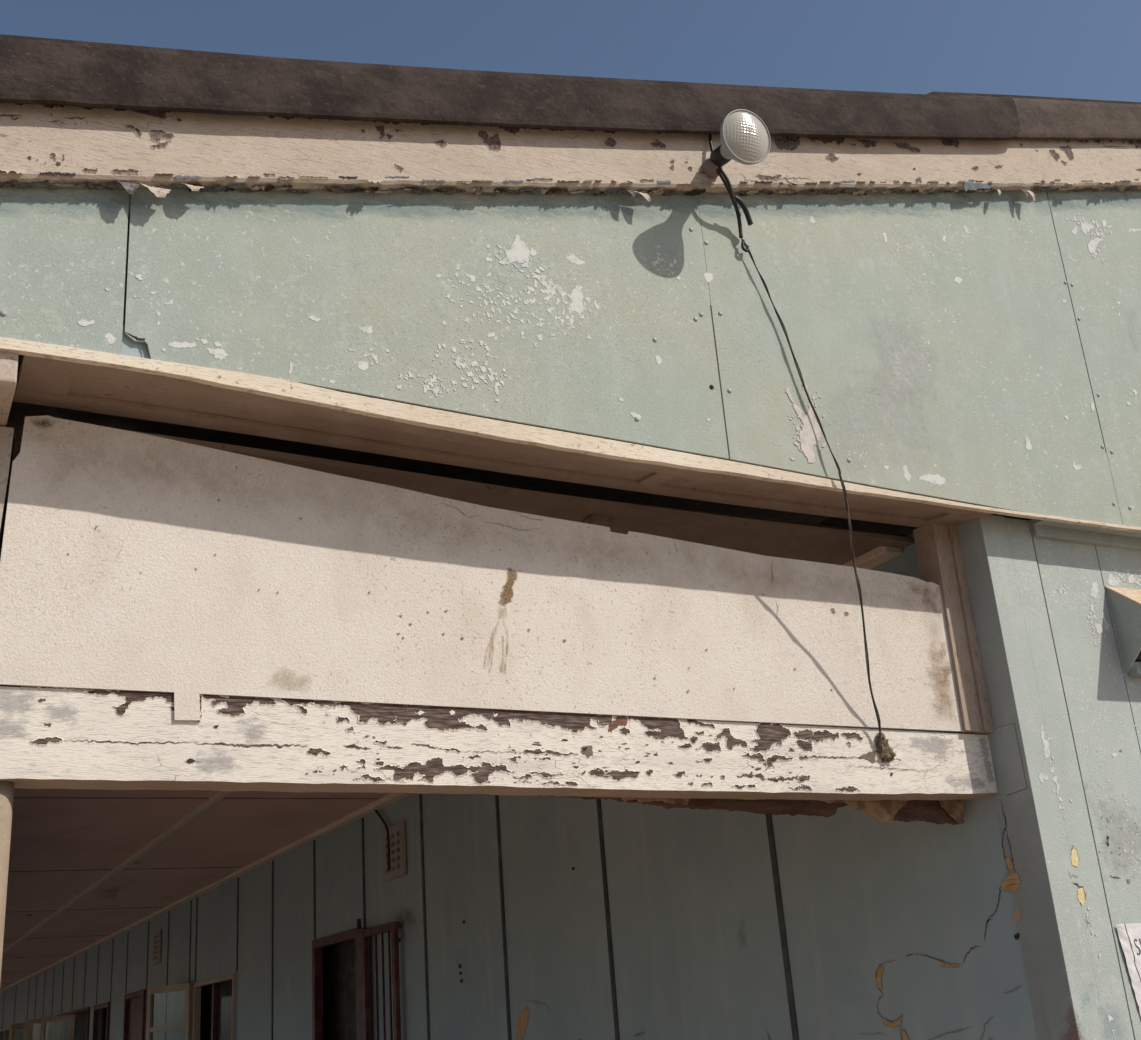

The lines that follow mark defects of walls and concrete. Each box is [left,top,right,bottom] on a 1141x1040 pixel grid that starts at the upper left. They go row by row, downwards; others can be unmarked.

peeling [42,104,182,149]
peeling [0,133,716,202]
peeling [477,127,618,151]
peeling [774,136,878,162]
peeling [737,165,1001,196]
peeling [1019,140,1141,166]
peeling [329,234,604,402]
peeling [785,384,831,463]
leakage [499,569,517,613]
peeling [0,686,174,737]
peeling [197,694,863,791]
crack [858,802,1021,1040]